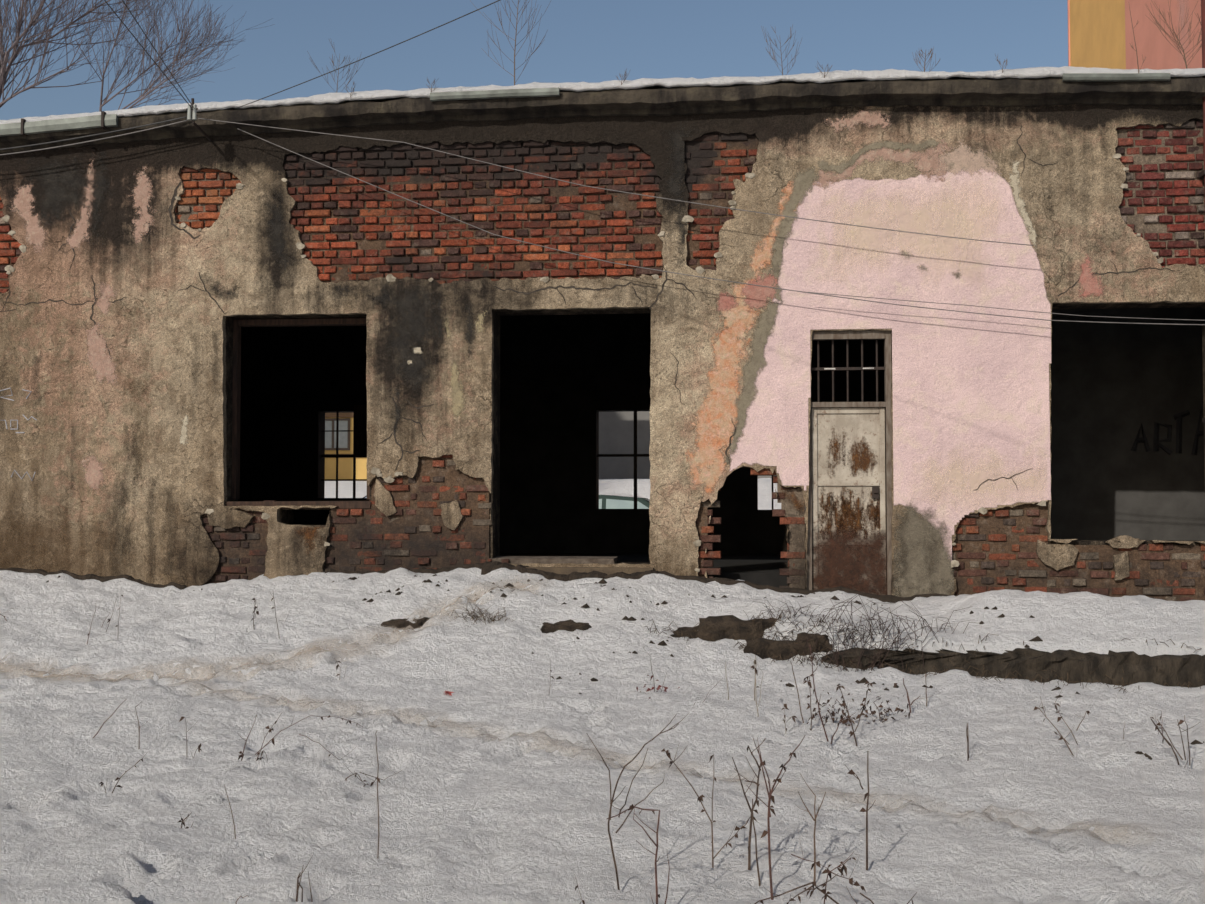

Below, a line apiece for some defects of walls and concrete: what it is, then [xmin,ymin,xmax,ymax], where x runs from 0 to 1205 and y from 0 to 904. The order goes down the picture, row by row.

peeling [826,110,889,133]
spalling [0,185,49,293]
leakage [27,152,111,236]
spalling [175,167,244,231]
spalling [281,140,665,284]
peeling [682,120,1205,601]
spalling [200,500,276,586]
spalling [298,455,509,573]
rust [780,430,887,595]